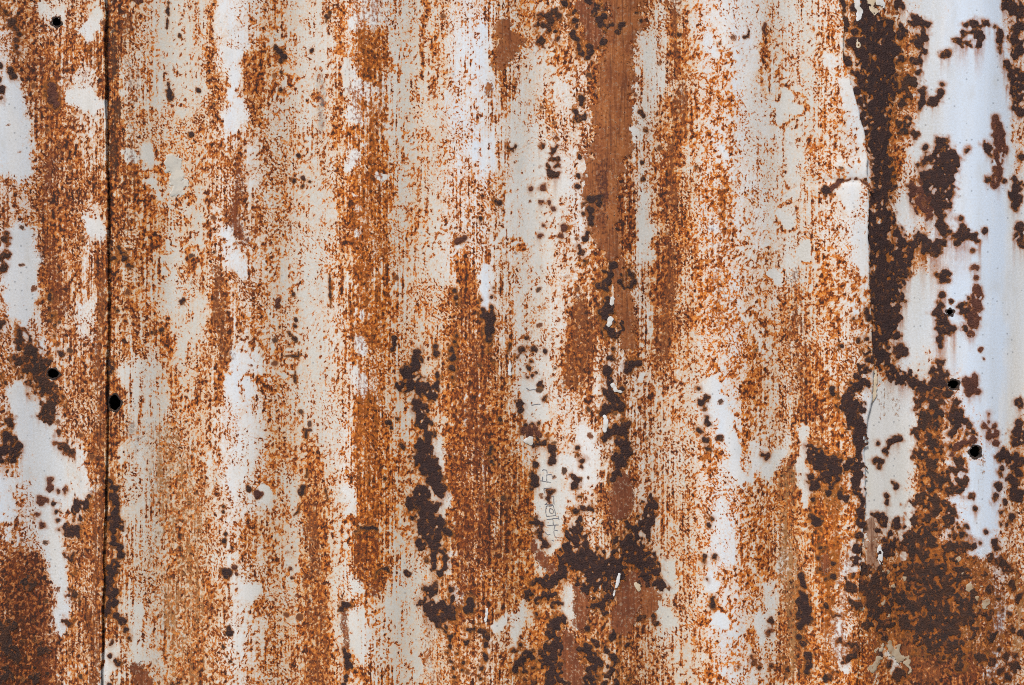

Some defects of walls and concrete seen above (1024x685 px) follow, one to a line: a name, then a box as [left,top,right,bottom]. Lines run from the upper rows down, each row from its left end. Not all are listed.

rust [0,1,23,100]
rust [35,57,65,126]
peeling [854,0,885,21]
rust [35,149,68,337]
rust [212,266,232,368]
rust [227,157,249,246]
rust [347,0,688,685]
rust [707,188,730,336]
rust [737,0,1024,685]
rust [0,212,135,685]
rust [149,423,213,685]